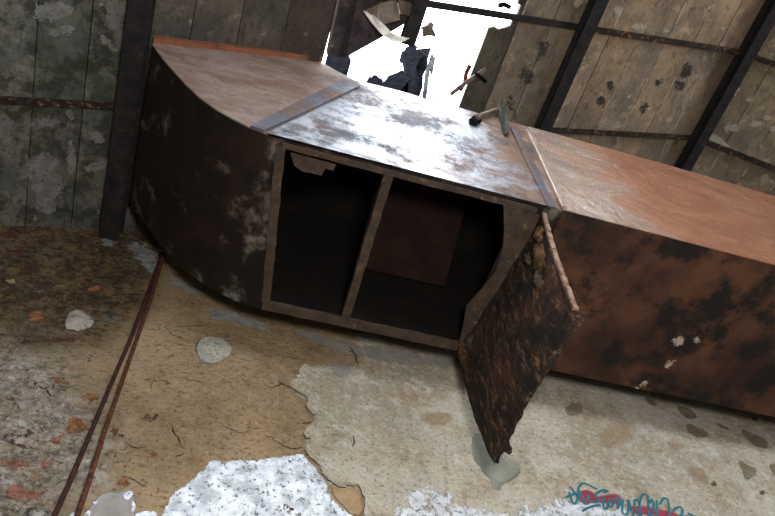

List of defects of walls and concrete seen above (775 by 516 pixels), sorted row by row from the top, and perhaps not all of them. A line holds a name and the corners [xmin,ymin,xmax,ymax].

damp [517,65,536,85]
mould [674,62,693,91]
mould [597,81,614,108]
rust [524,225,546,292]
crack [222,425,302,449]
spalling [472,433,521,490]
peeling [392,477,633,516]